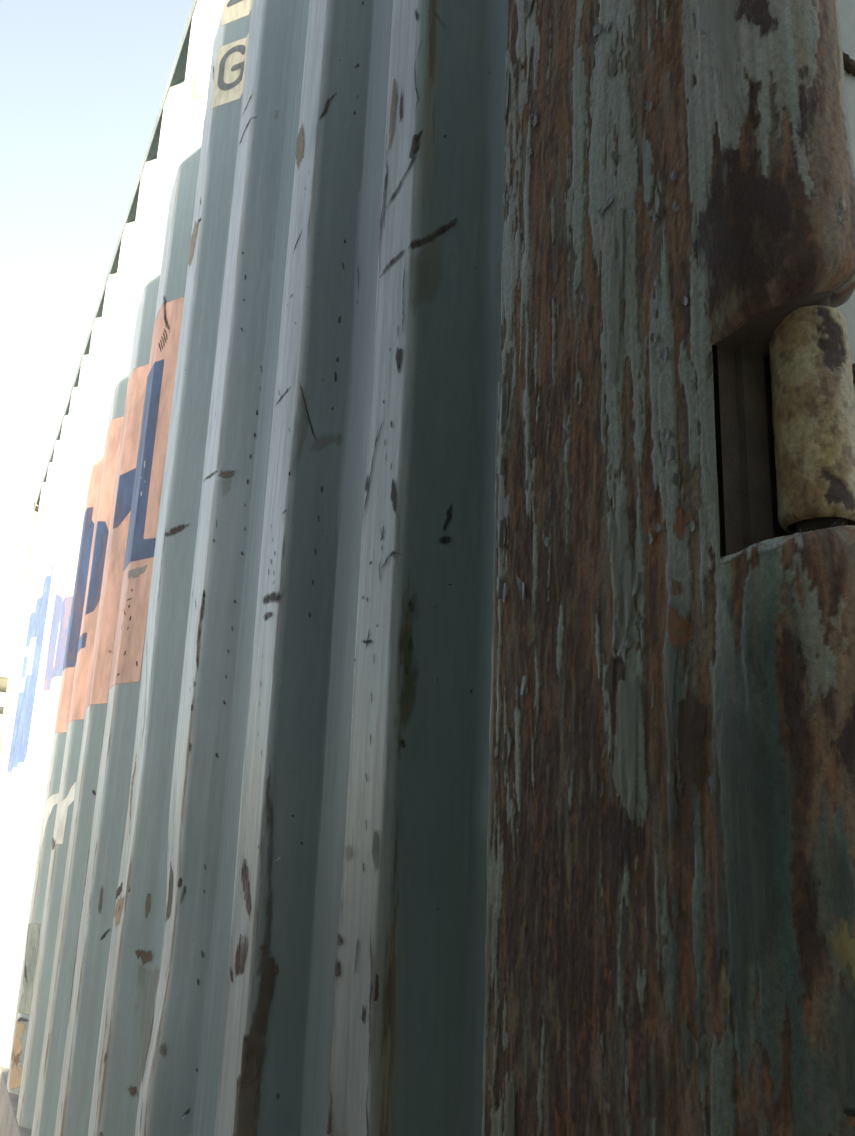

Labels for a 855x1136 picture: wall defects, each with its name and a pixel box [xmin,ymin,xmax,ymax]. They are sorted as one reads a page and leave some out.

corrosion [735,0,779,36]
corrosion [749,81,761,128]
corrosion [797,65,818,143]
corrosion [241,858,251,916]
corrosion [136,949,152,964]
corrosion [230,894,278,1136]
corrosion [129,1010,154,1127]